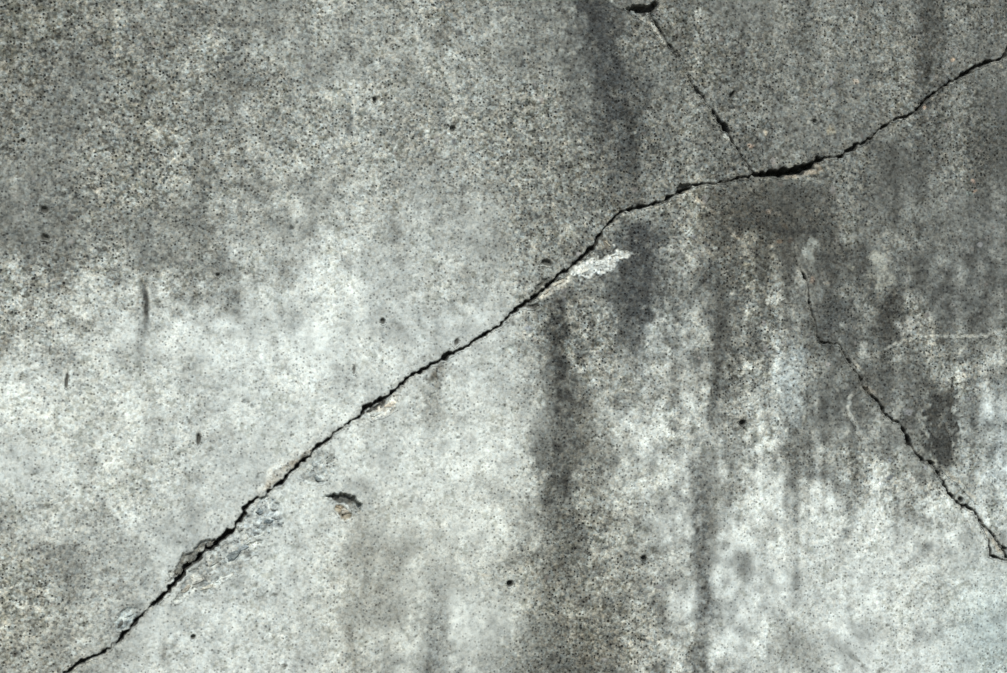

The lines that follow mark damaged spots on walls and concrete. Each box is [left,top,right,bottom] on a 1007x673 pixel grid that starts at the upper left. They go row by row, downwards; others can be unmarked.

crack [61,193,680,673]
water stain [473,0,672,673]
spalling [533,238,637,302]
crack [686,191,742,243]
crack [607,0,1007,195]
water stain [660,182,961,673]
crack [788,199,1007,562]
crack [831,641,889,673]